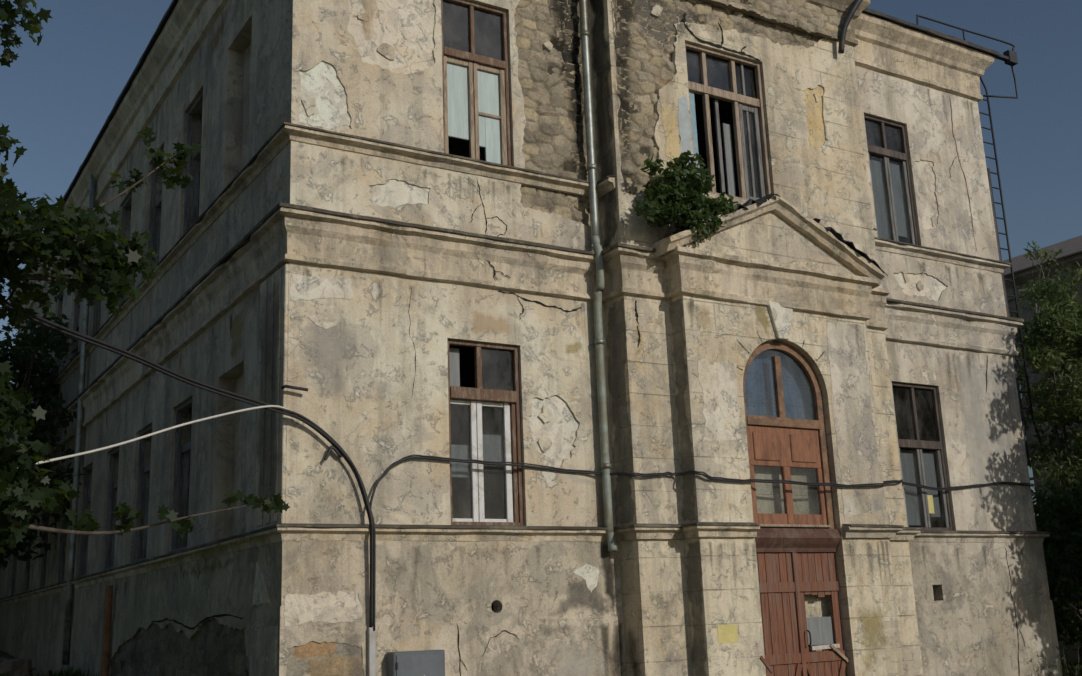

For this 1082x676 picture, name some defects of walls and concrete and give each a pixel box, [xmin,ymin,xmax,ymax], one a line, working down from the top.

flaking render [299,61,351,129]
flaking render [514,0,588,181]
flaking render [612,0,851,195]
flaking render [520,185,590,226]
crack [471,180,581,319]
damp [670,301,692,446]
damp [681,462,695,520]
flaking render [283,591,363,626]
flaking render [574,563,599,593]
damp [570,546,615,610]
damp [687,542,705,676]
damp [603,628,637,676]